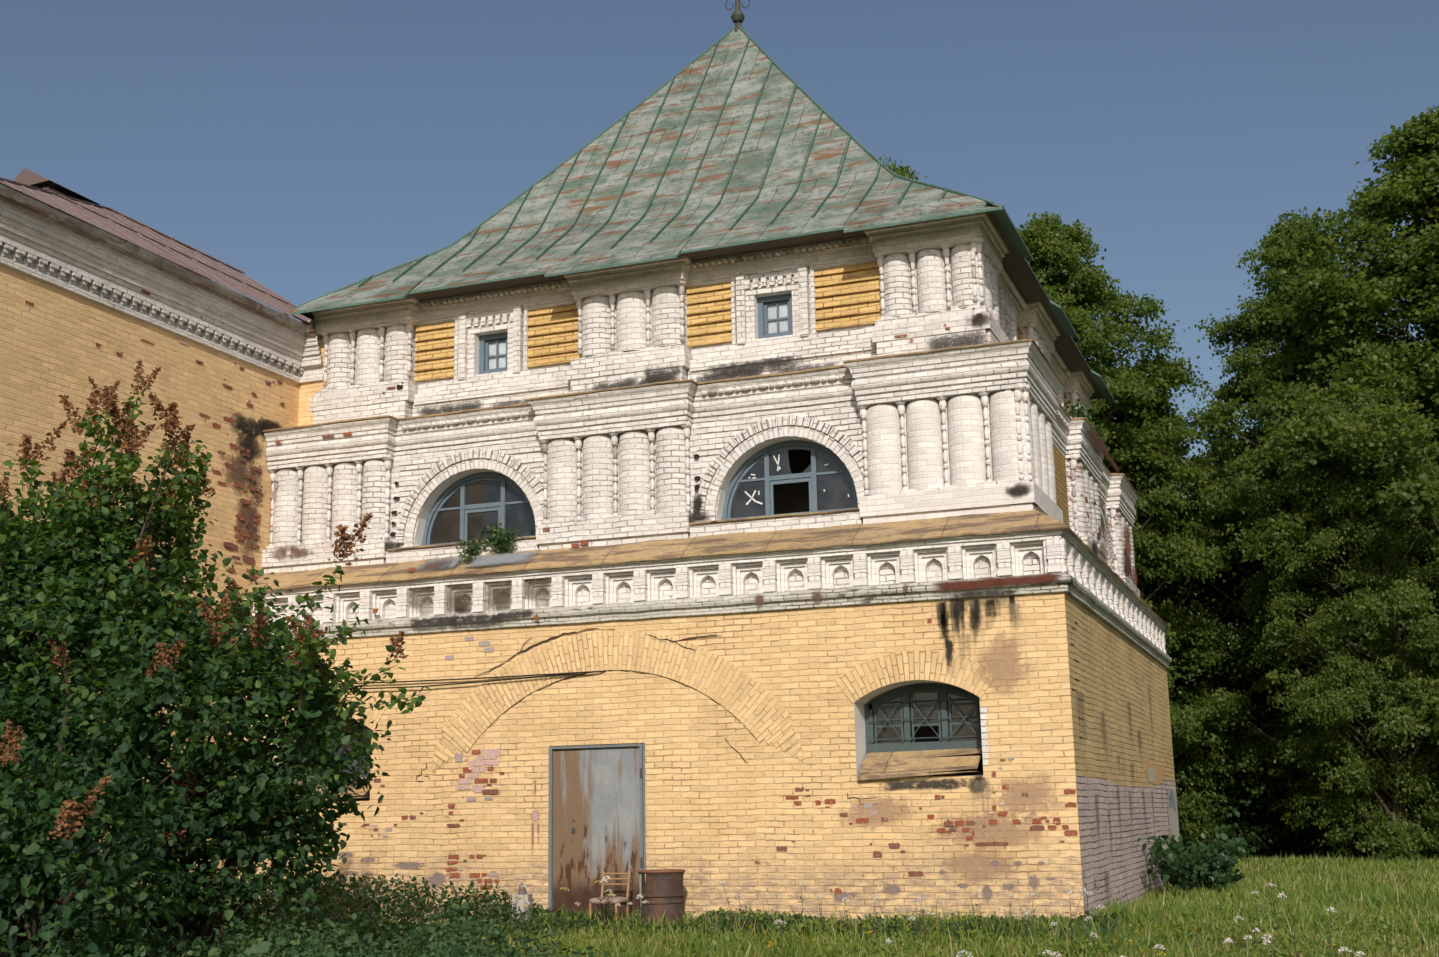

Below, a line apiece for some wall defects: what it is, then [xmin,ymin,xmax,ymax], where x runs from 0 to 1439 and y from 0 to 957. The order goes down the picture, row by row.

peeling [464,636,494,653]
water stain [937,596,1015,665]
crack [474,628,756,764]
peeling [342,812,423,838]
peeling [445,748,504,827]
peeling [785,787,895,825]
peeling [919,757,1078,899]
peeling [870,843,905,858]
peeling [830,888,853,901]
peeling [886,871,923,894]